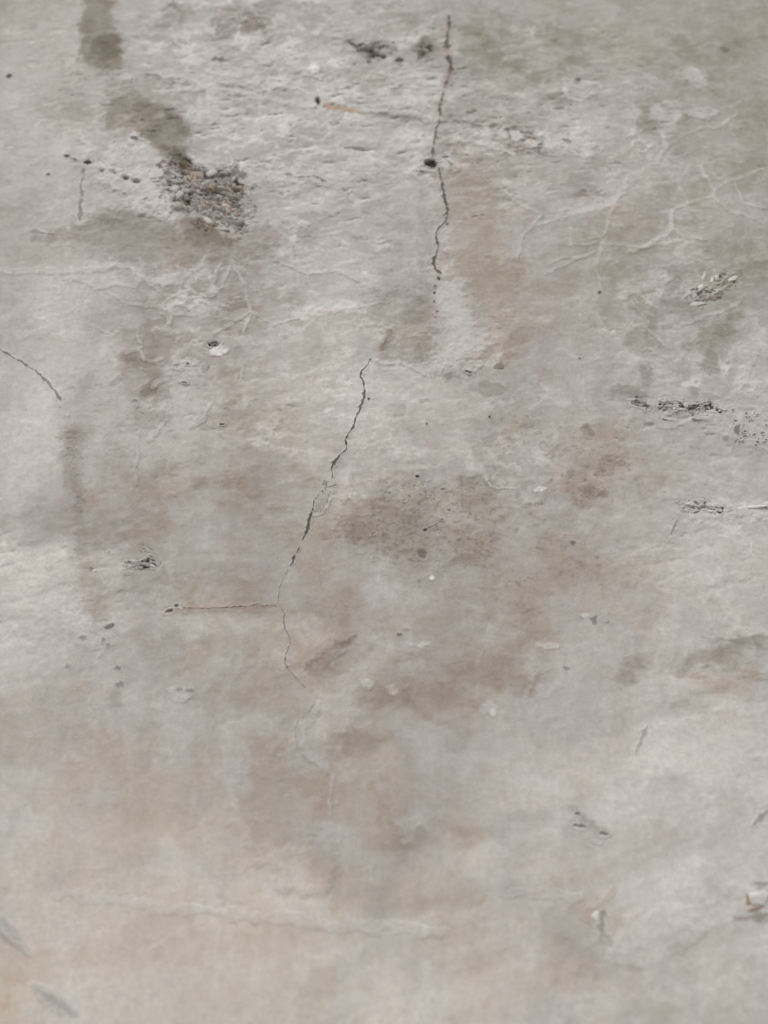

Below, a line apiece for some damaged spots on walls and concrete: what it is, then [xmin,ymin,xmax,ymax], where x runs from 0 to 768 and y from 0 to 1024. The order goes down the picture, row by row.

leakage [72,0,197,165]
spalling [338,32,442,65]
spalling [61,146,265,243]
crack [424,15,502,319]
spalling [680,264,743,309]
crack [0,347,71,418]
spalling [627,384,768,458]
crack [161,357,373,763]
leakage [330,468,504,578]
spalling [670,494,768,528]